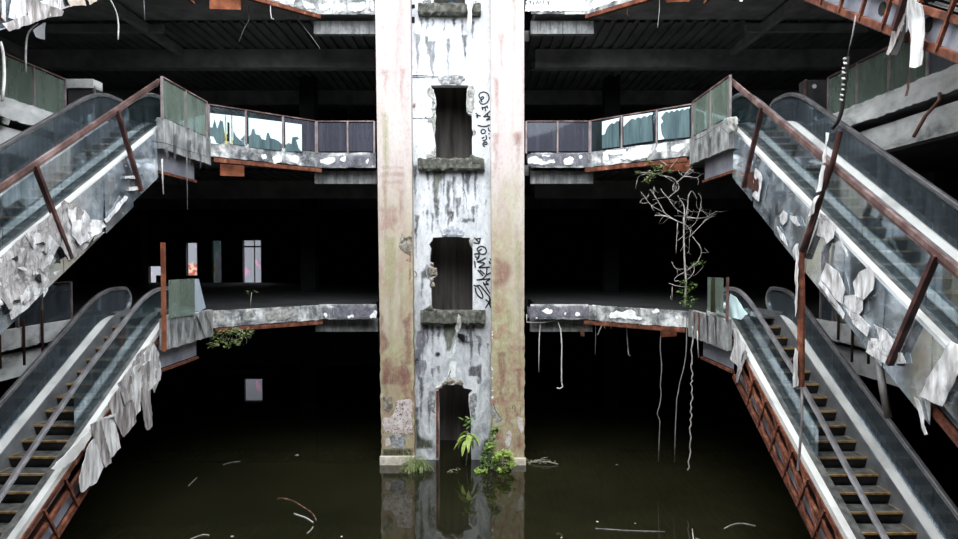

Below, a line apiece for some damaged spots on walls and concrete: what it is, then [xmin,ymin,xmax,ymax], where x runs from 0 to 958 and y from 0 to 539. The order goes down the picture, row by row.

peeling [275,0,374,12]
peeling [525,0,618,12]
water stain [415,18,474,73]
spalling [427,74,476,132]
spalling [440,225,474,247]
peeling [817,213,848,257]
spalling [428,263,438,288]
peeling [213,312,227,323]
peeling [243,309,298,320]
peeling [609,309,660,320]
peeling [818,263,906,364]
peeling [381,394,413,449]